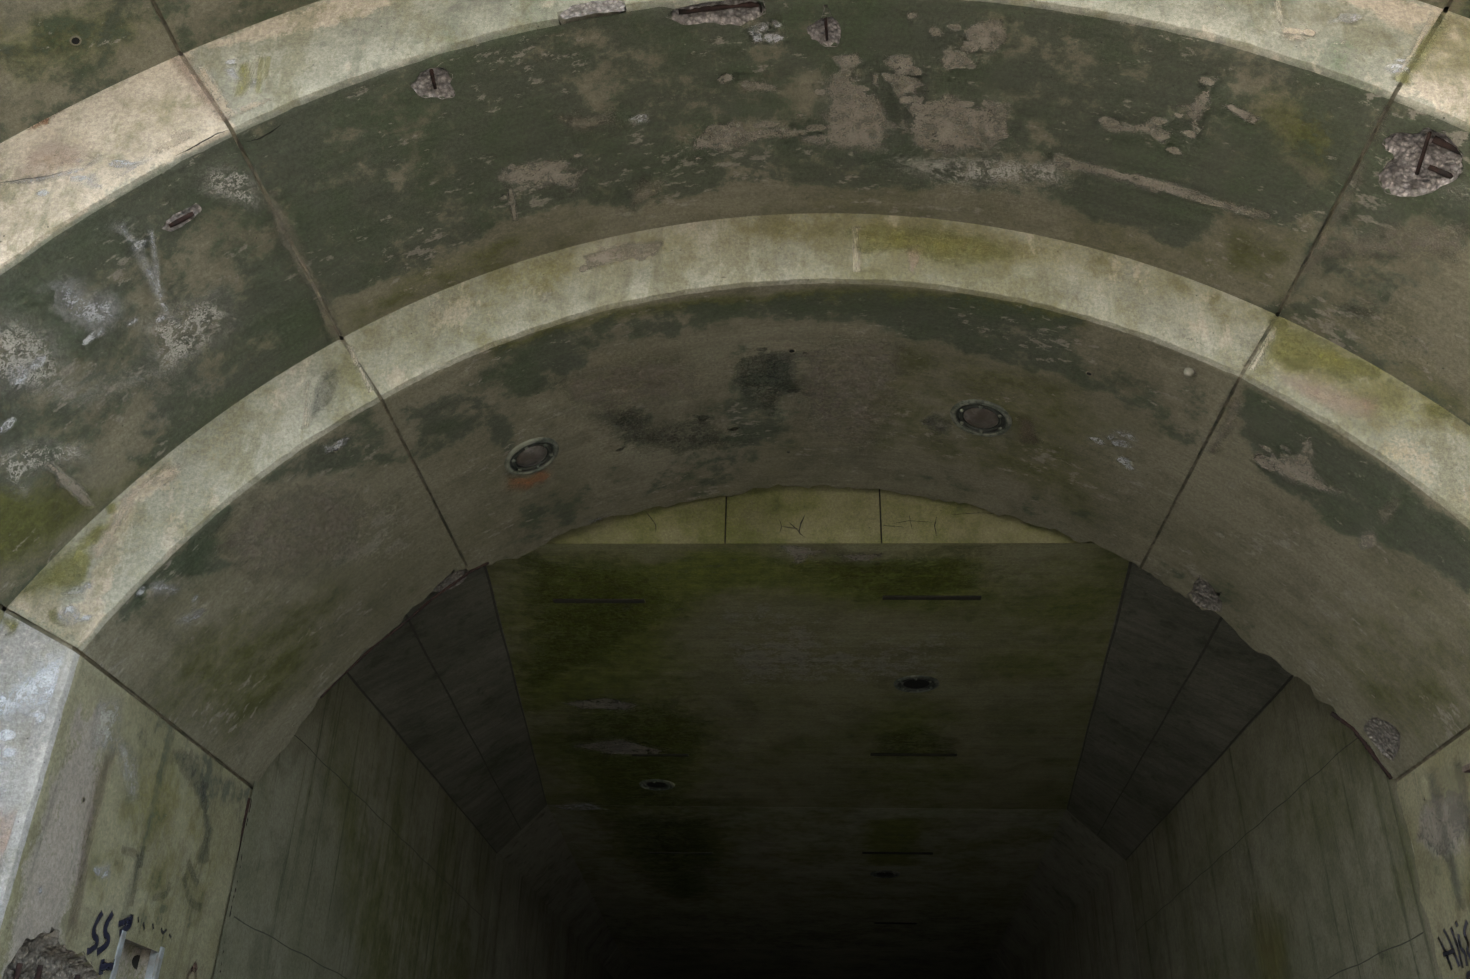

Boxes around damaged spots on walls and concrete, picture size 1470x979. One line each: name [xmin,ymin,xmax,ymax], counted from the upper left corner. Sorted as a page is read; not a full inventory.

spalling [666,0,766,26]
spalling [411,67,455,100]
peeling [692,5,1013,160]
spalling [1378,127,1464,197]
water stain [120,226,167,323]
water stain [55,285,138,345]
water stain [9,356,46,385]
spalling [3,930,102,979]